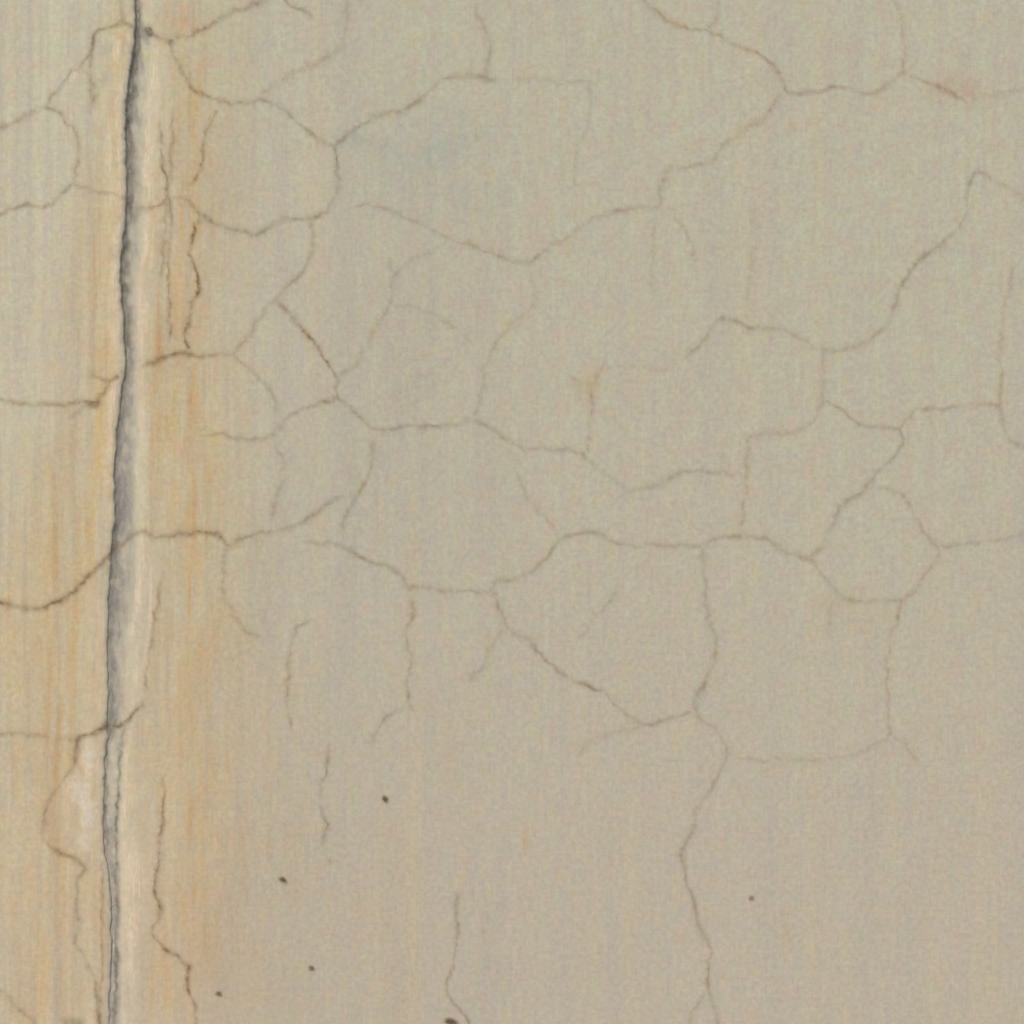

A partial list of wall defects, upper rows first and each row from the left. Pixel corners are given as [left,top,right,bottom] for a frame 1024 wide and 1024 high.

crack [43,6,148,746]
crack [191,226,199,295]
crack [103,756,120,1024]